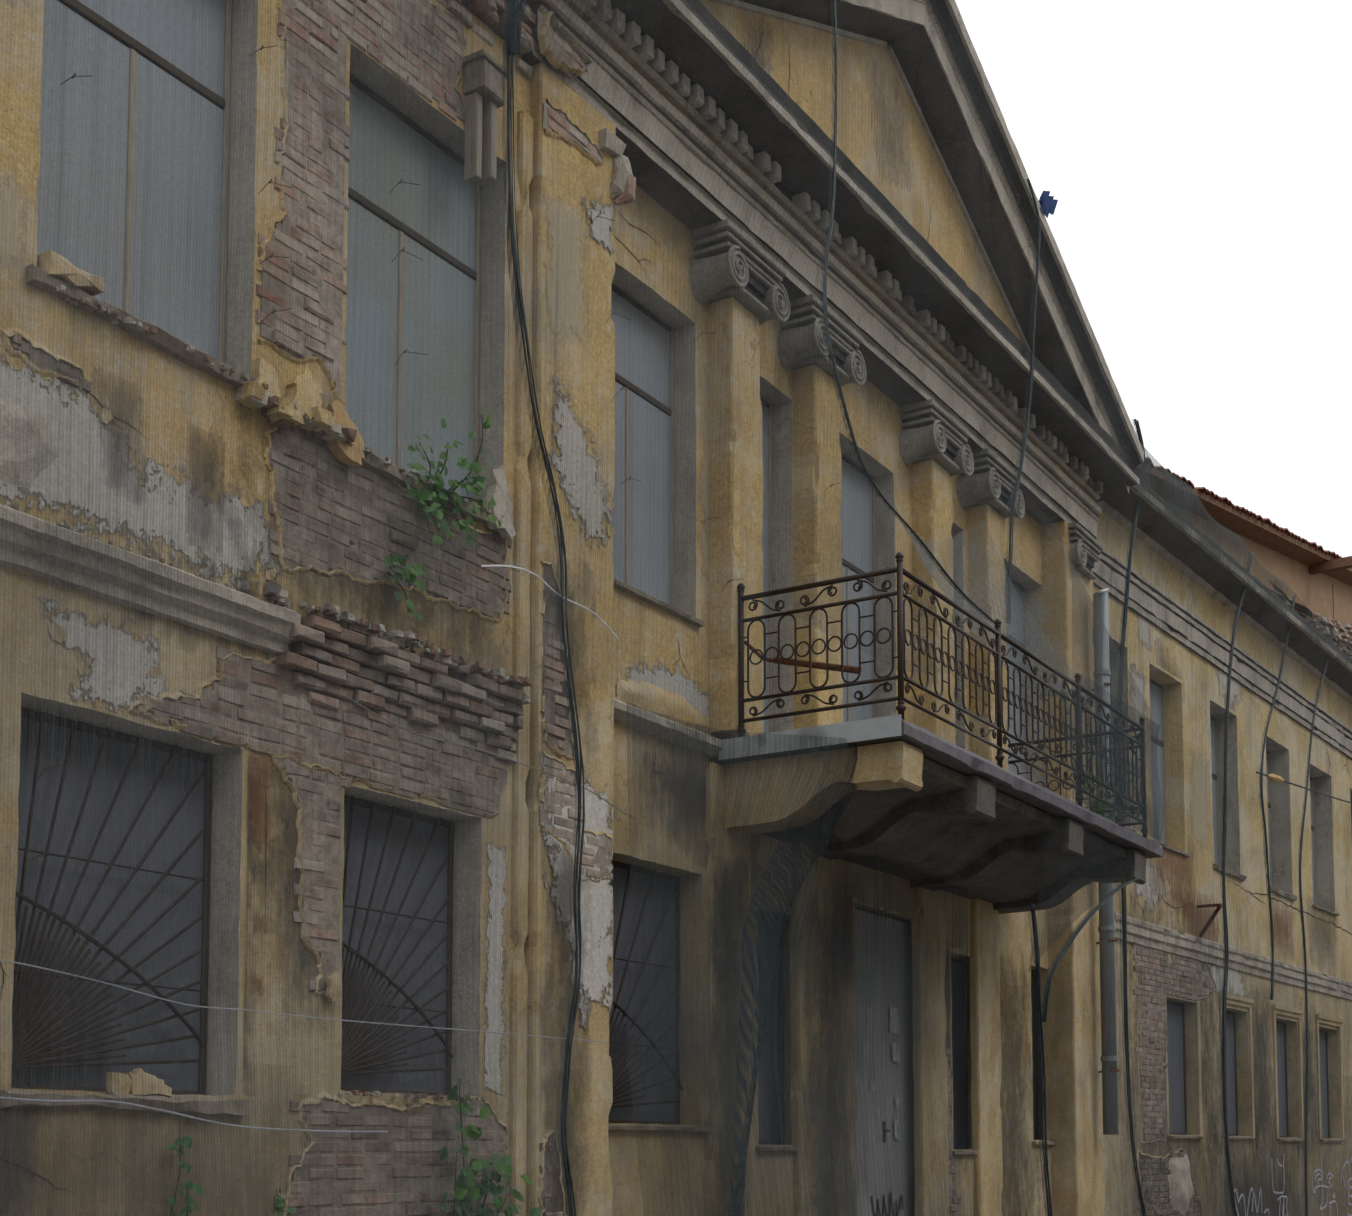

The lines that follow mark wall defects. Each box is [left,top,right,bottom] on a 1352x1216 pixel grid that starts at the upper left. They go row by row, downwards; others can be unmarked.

spalling [255,0,467,411]
peeling [582,197,615,254]
spalling [0,326,512,624]
peeling [544,372,615,549]
peeling [539,560,613,1032]
spalling [274,841,509,1216]
spalling [1132,944,1251,1216]